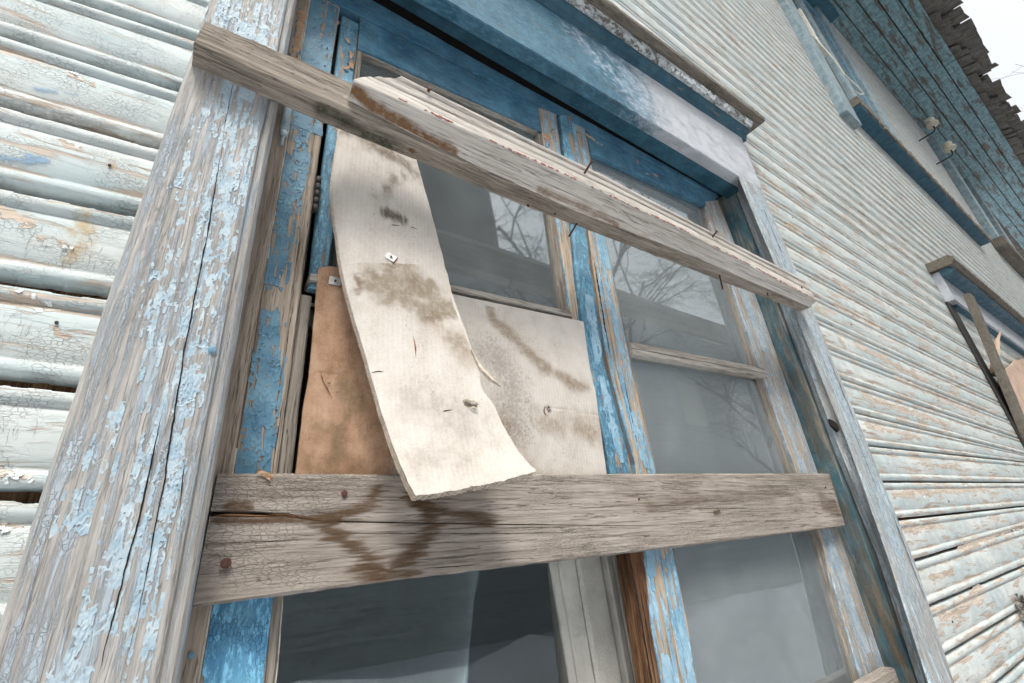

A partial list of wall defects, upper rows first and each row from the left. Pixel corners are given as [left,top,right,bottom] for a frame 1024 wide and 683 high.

peeling [203,0,279,51]
peeling [289,0,355,73]
rust [350,85,457,155]
peeling [264,110,323,291]
peeling [46,75,259,683]
crack [96,85,233,683]
peeling [235,307,287,474]
peeling [585,294,624,463]
leakage [212,487,497,582]
crack [212,511,571,543]
peeling [202,597,273,683]
peeling [643,550,695,683]